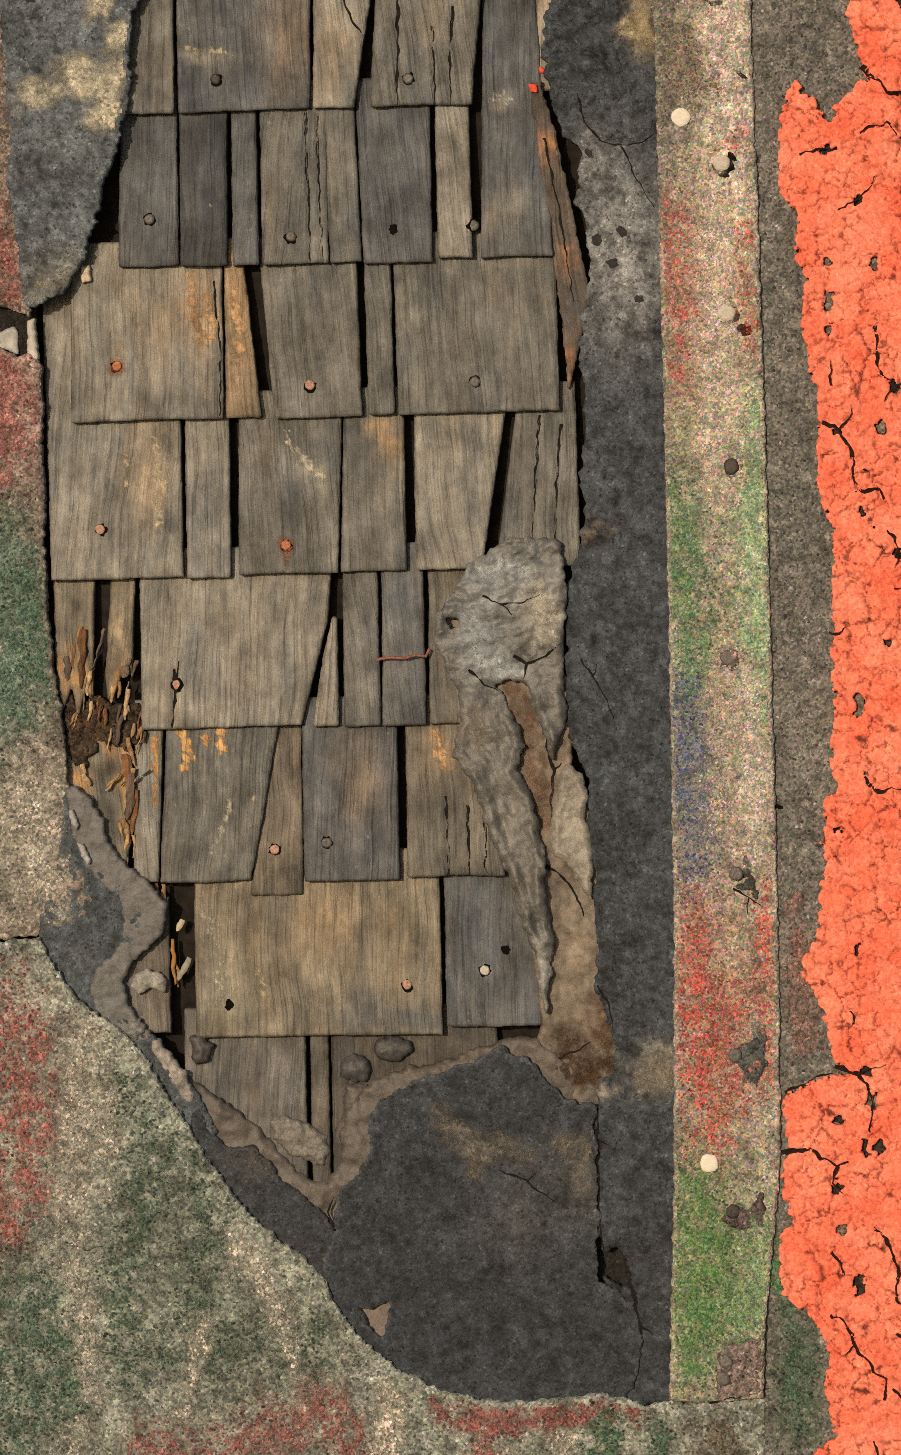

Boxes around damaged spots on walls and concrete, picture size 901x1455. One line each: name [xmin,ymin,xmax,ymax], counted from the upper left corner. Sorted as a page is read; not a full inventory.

crack [859,64,901,139]
peeling [80,265,92,283]
peeling [204,291,218,340]
peeling [0,318,40,370]
crack [822,326,901,589]
peeling [200,728,228,756]
crack [864,776,901,794]
peeling [69,809,91,864]
crack [784,1064,887,1132]
crack [782,1147,849,1194]
crack [873,1227,901,1338]
crack [830,1315,901,1401]